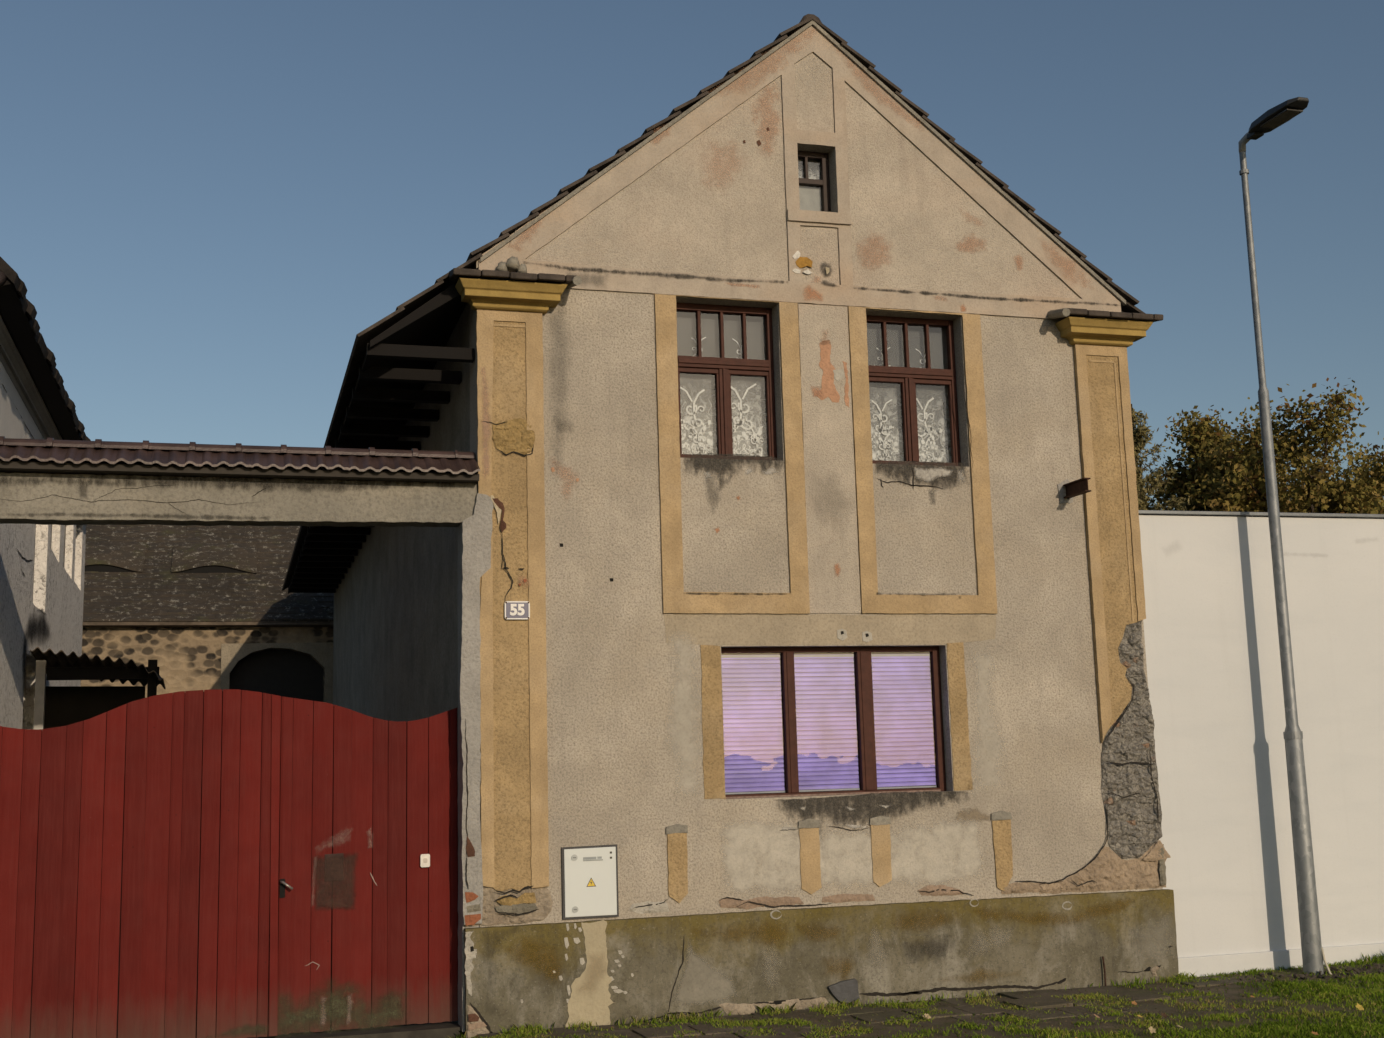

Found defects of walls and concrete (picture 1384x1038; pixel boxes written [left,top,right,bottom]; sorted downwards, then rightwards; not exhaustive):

peeling [813,340,849,407]
damp [687,453,782,477]
damp [876,461,966,487]
spalling [490,495,506,532]
flaking render [1001,620,1171,894]
damp [780,791,960,830]
flaking render [464,836,553,1038]
peeling [553,923,585,1003]
peeling [611,950,634,994]
crack [638,941,828,1023]
crack [860,978,1066,997]